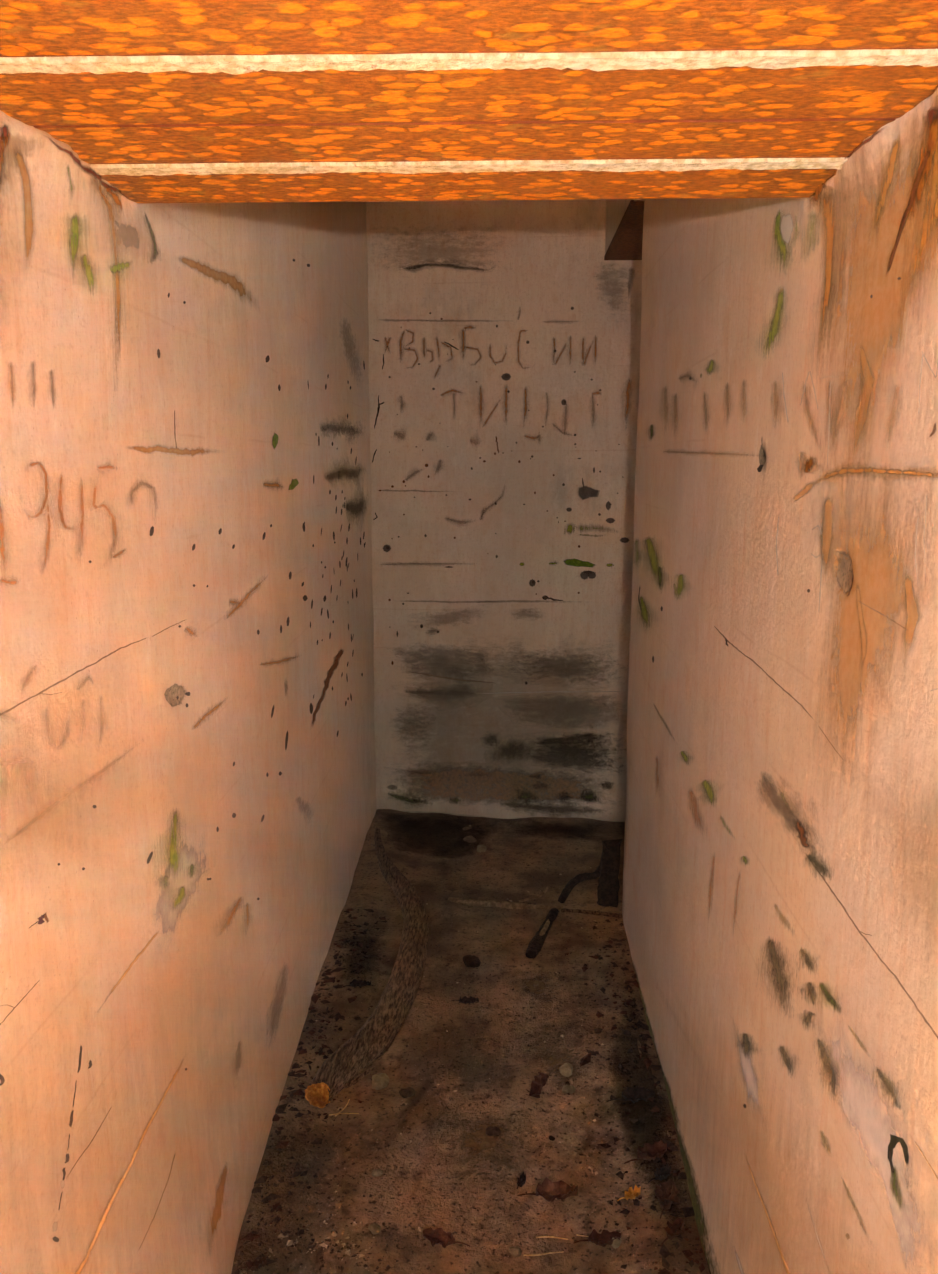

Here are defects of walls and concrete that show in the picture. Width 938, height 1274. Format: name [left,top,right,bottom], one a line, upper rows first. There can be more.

damp [486,733,616,766]